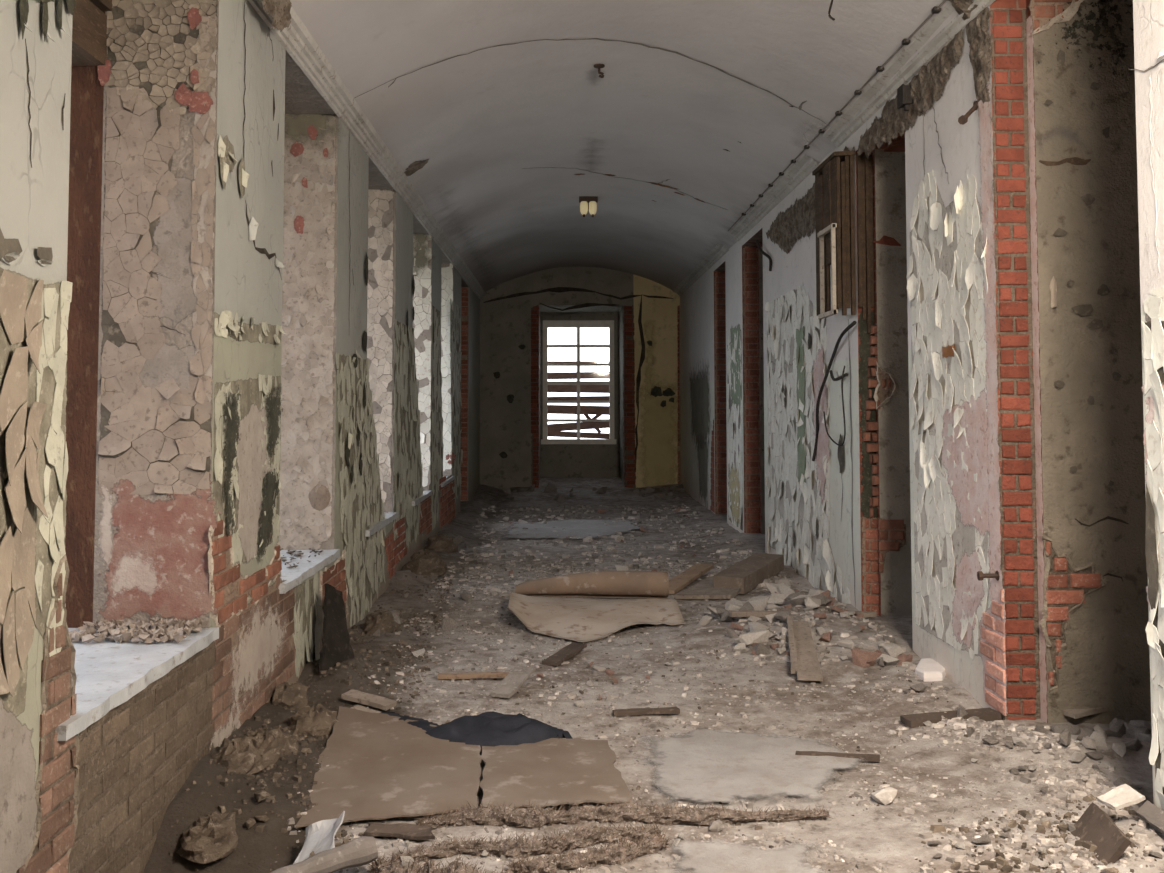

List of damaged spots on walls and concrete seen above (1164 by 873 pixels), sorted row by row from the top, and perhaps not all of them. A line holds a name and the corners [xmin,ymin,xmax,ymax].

crack [243,4,279,175]
crack [245,200,284,280]
crack [355,38,829,126]
crack [1129,47,1164,269]
crack [484,287,673,472]
spalling [710,0,1110,723]
peeling [1142,287,1164,811]